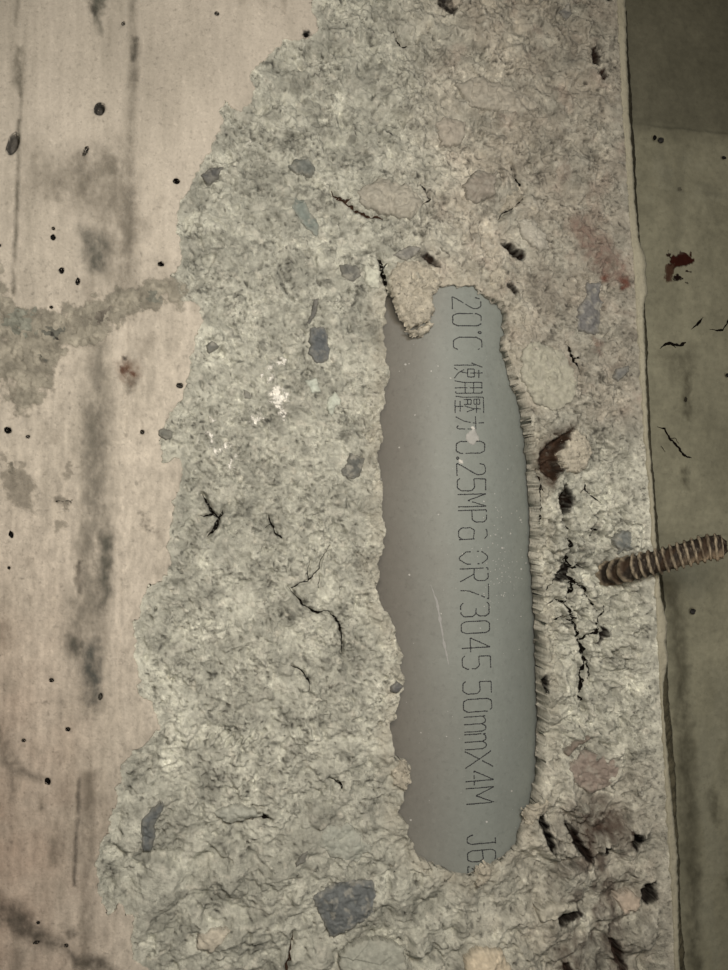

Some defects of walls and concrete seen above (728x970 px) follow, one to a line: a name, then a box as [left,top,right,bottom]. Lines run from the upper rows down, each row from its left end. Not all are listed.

rust [664,250,694,284]
crack [660,318,728,349]
crack [659,427,691,458]
crack [200,494,223,537]
spalling [94,0,674,970]
crack [535,468,544,526]
crack [289,545,342,652]
crack [546,484,604,707]
leakage [71,639,98,686]
leakage [2,907,45,941]
crack [285,933,293,970]